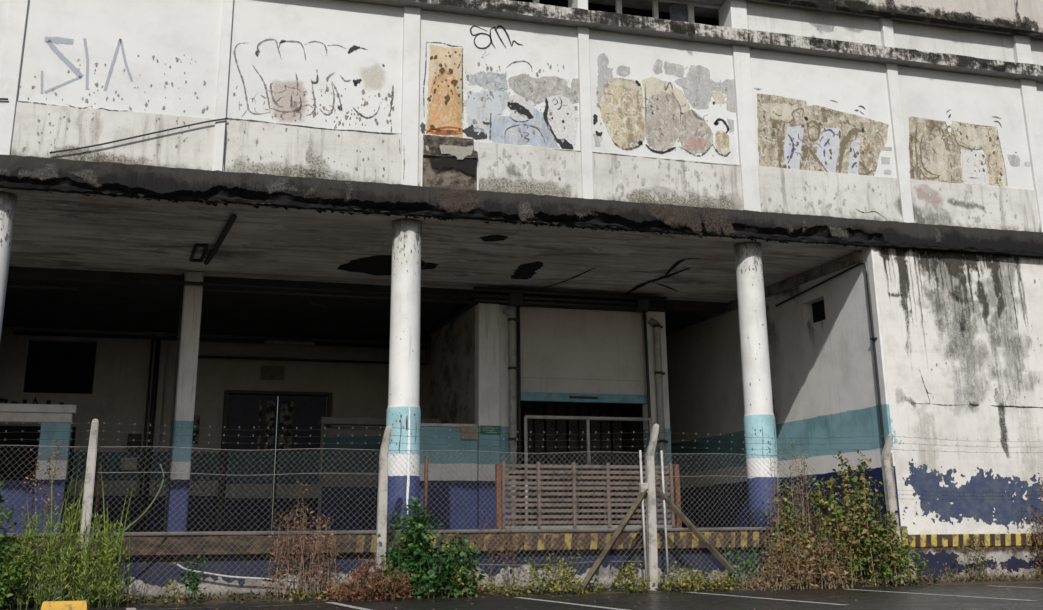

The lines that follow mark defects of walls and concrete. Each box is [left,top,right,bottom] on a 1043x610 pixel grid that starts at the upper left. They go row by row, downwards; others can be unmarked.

damp [670,21,694,39]
damp [810,35,839,50]
damp [886,0,926,14]
damp [909,49,941,65]
damp [944,11,976,24]
damp [993,1,1039,32]
peeling [466,62,573,186]
peeling [761,120,888,231]
spalling [436,185,483,212]
damp [878,247,1041,370]
damp [998,404,1008,456]
peeling [902,458,1043,533]